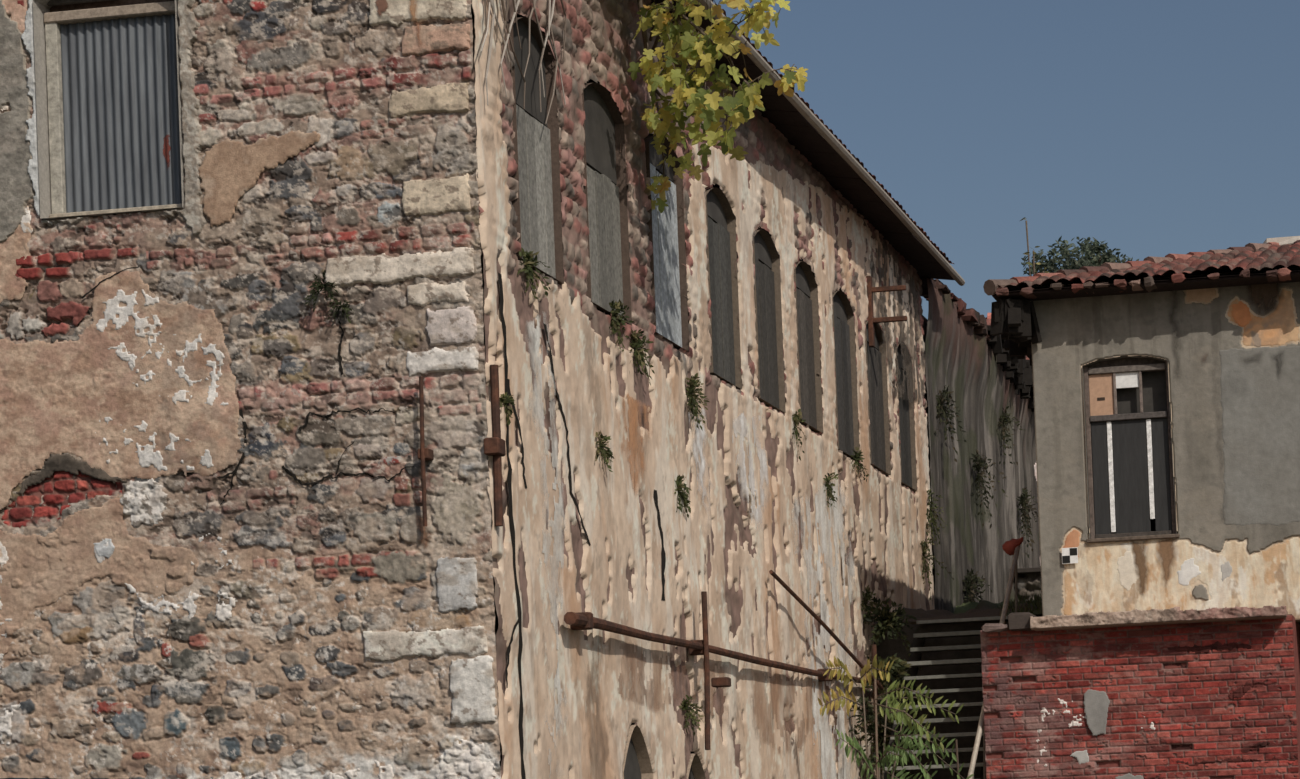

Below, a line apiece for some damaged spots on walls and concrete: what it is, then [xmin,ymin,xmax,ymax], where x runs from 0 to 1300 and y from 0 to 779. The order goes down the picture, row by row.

rust [163,135,171,167]
crack [336,314,344,375]
peeling [1186,288,1216,303]
peeling [1227,289,1300,347]
peeling [0,206,242,662]
crack [282,407,414,486]
damp [1132,538,1174,595]
peeling [1063,530,1300,619]
peeling [0,703,21,745]
peeling [223,771,277,779]
peeling [305,768,360,779]
peeling [374,756,394,779]